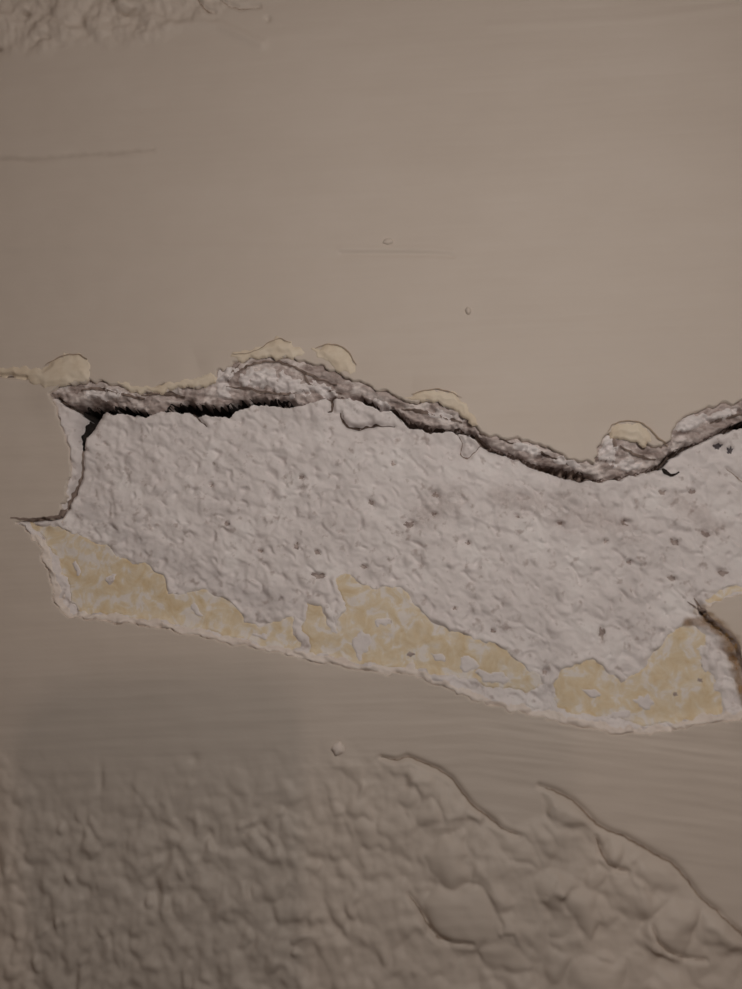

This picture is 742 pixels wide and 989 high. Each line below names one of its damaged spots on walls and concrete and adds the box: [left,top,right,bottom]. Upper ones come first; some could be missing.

flaking render [0,336,742,735]
crack [10,360,742,522]